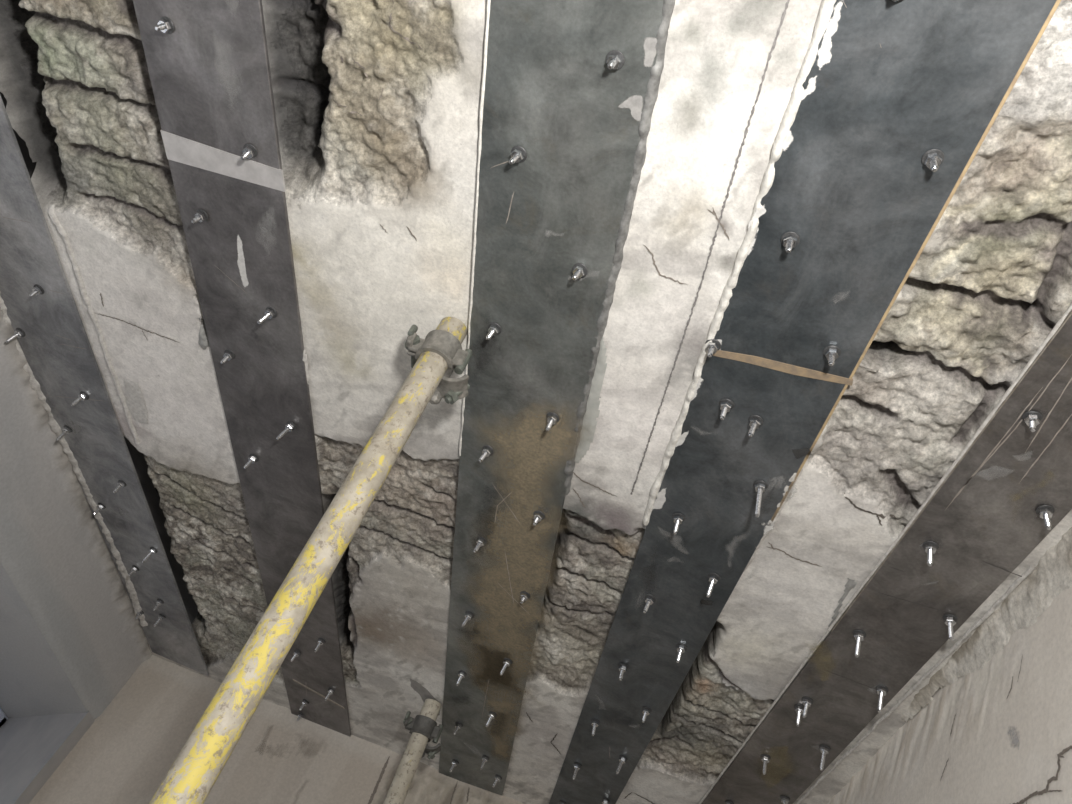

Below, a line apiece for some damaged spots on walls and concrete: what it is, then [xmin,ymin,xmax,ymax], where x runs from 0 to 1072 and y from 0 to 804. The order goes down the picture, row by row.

spalling [0,0,204,326]
spalling [269,0,464,210]
spalling [807,0,1072,538]
spalling [315,434,364,513]
spalling [333,450,460,688]
corrosion [467,411,574,758]
spalling [527,509,645,698]
spalling [635,623,775,786]
crack [1013,745,1072,804]